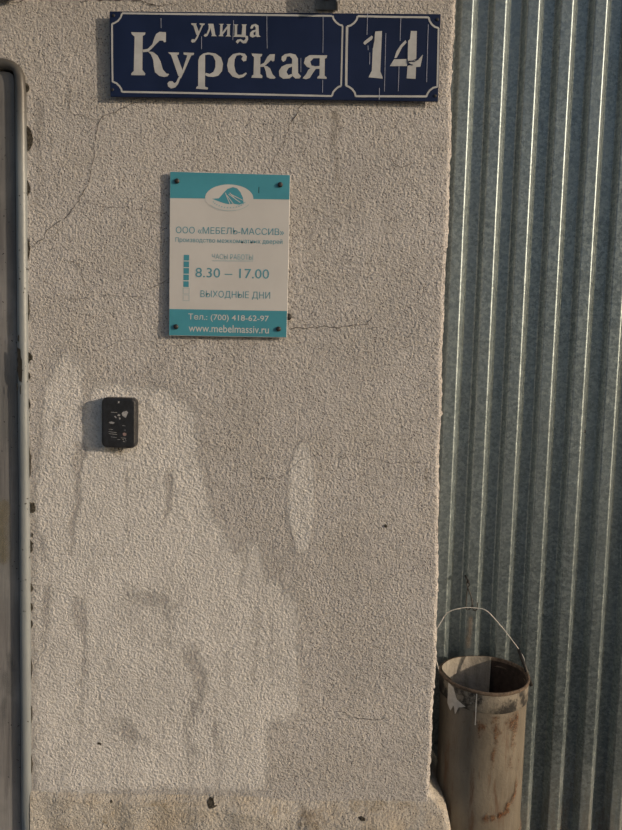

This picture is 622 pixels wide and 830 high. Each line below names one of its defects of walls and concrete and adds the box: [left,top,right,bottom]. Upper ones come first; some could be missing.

crack [30,81,165,303]